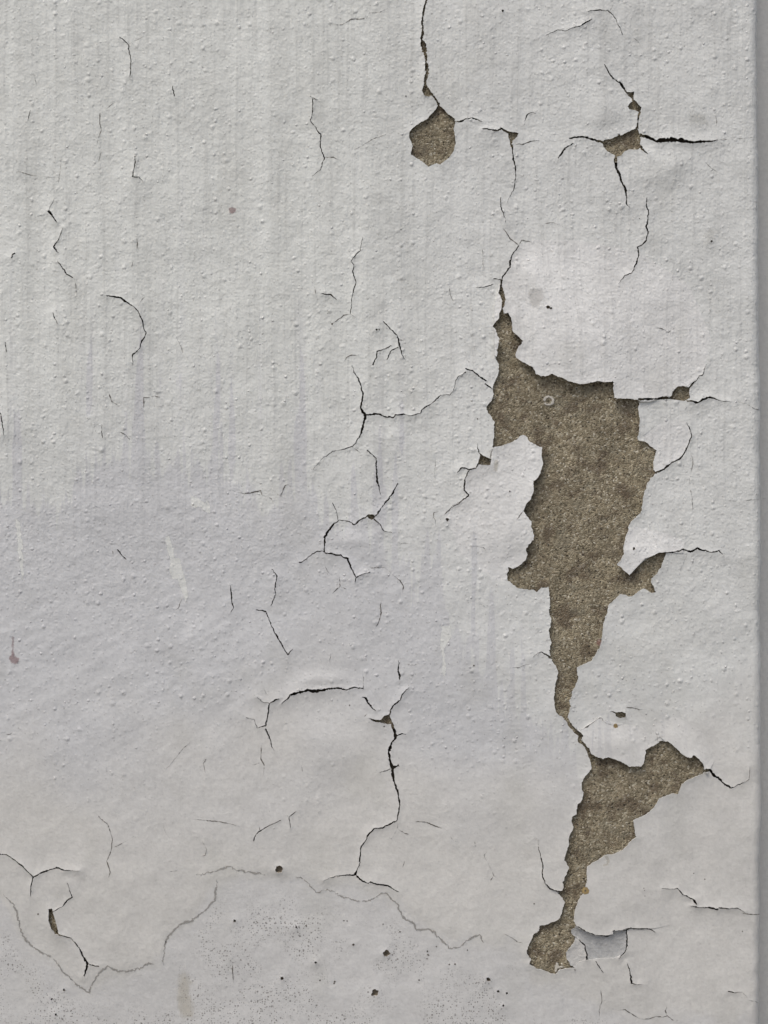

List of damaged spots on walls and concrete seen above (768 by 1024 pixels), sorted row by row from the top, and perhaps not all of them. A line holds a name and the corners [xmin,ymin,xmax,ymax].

crack [420,0,437,101]
peeling [409,100,460,167]
peeling [558,66,716,206]
crack [460,112,553,288]
crack [618,198,649,284]
crack [108,295,147,365]
crack [299,322,488,592]
crack [660,426,693,507]
crack [670,546,722,554]
peeling [445,240,726,974]
crack [246,660,439,892]
crack [0,854,74,893]